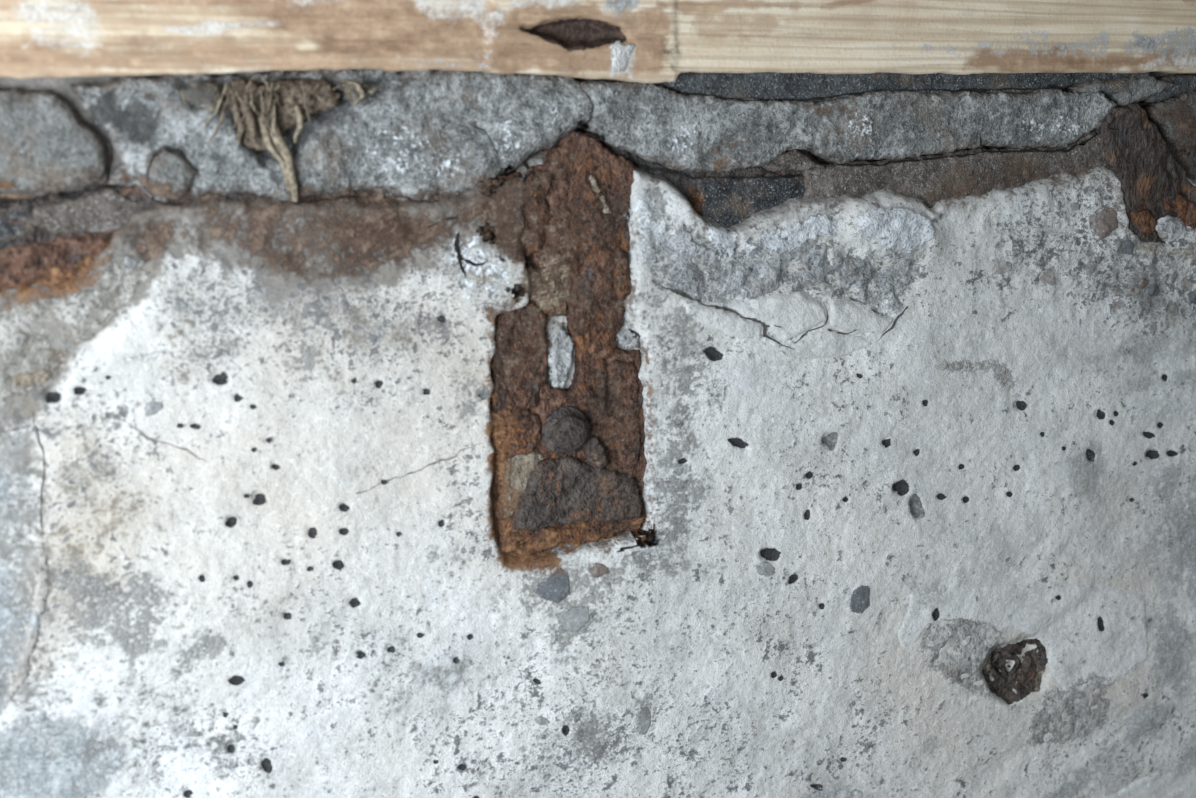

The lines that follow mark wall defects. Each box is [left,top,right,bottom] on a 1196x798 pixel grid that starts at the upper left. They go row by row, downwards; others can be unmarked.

corrosion [1,245,111,304]
crack [657,284,908,350]
corrosion [81,148,657,574]